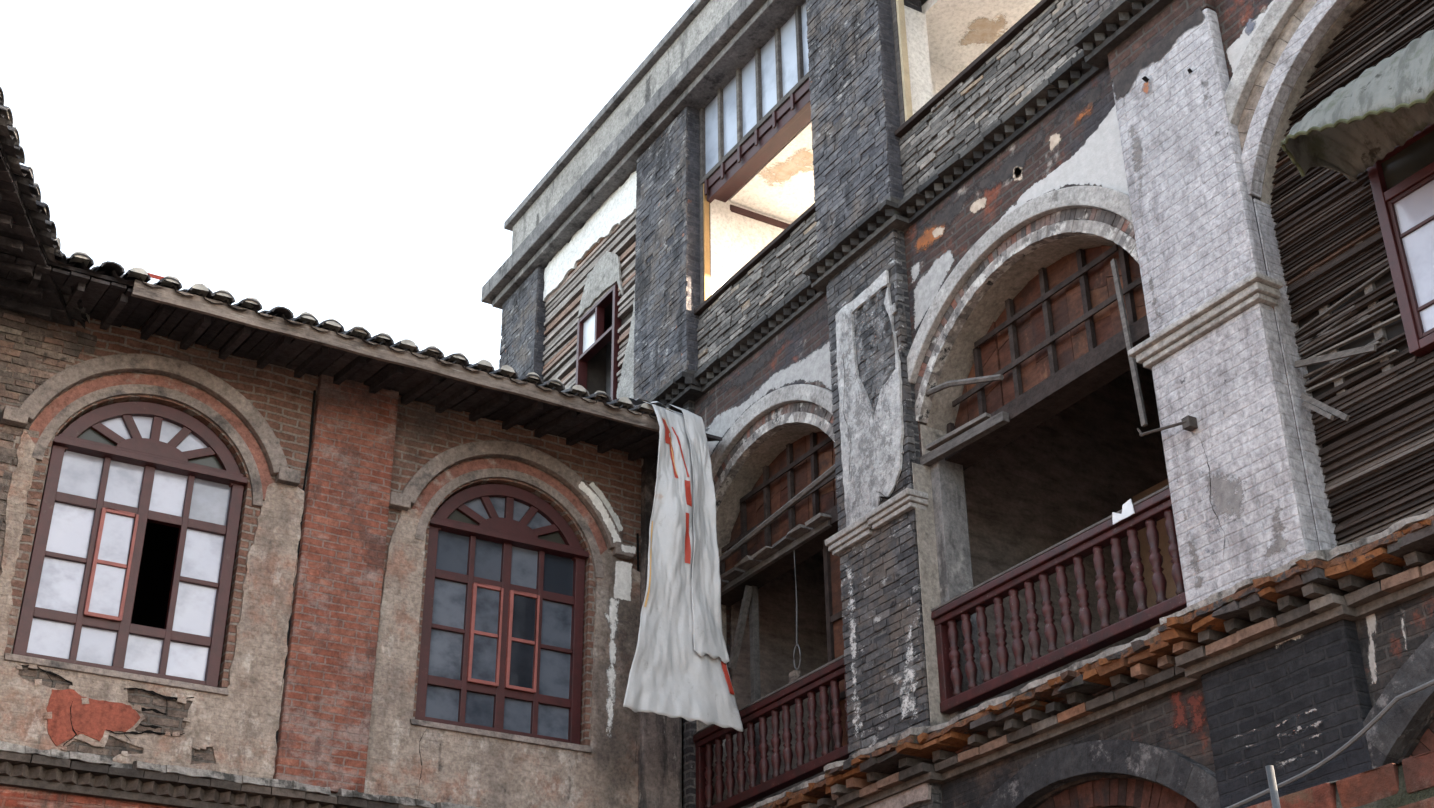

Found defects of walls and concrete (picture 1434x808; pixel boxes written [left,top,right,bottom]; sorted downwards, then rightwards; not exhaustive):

damp [961,15,1008,45]
damp [759,148,814,186]
peeling [970,197,987,214]
peeling [1000,103,1144,220]
peeling [911,226,954,330]
flaking render [0,312,97,569]
flaking render [705,270,904,527]
peeling [1188,540,1202,588]
peeling [1265,507,1288,557]
peeling [16,664,215,765]
peeling [846,569,864,737]
peeling [900,626,918,719]